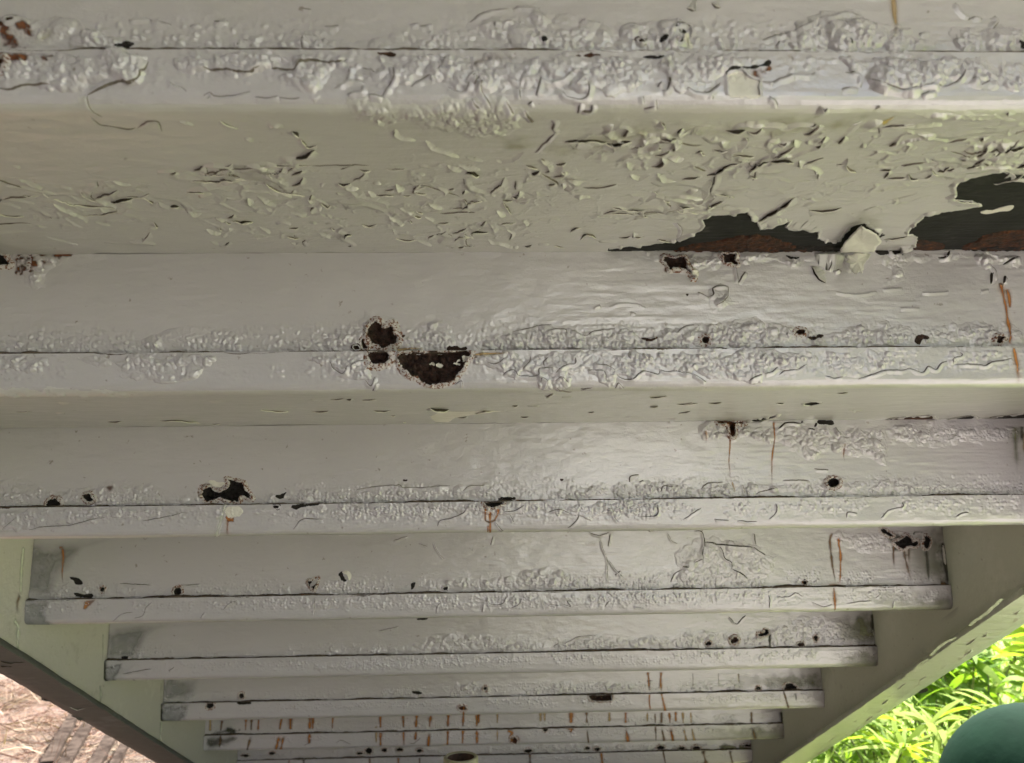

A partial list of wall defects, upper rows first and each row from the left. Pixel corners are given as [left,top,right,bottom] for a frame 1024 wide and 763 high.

rust [0,20,32,61]
peeling [723,66,763,99]
peeling [564,105,1024,283]
rust [15,254,72,275]
rust [999,284,1019,373]
peeling [425,408,500,422]
crack [845,501,906,520]
crack [955,511,969,519]
crack [471,468,829,612]
rust [402,716,432,746]
rust [646,672,695,763]